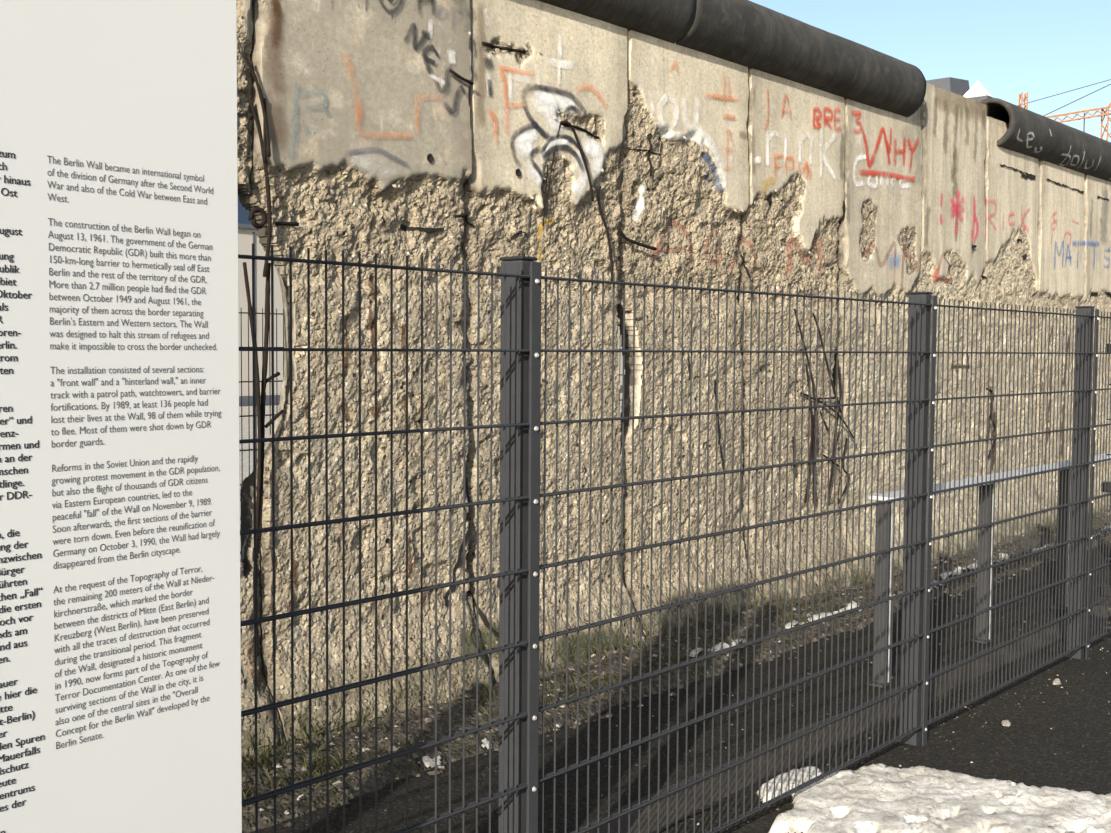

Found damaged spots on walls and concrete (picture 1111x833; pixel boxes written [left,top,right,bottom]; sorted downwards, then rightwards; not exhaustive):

crack [444,450,499,638]
spalling [236,0,1111,758]